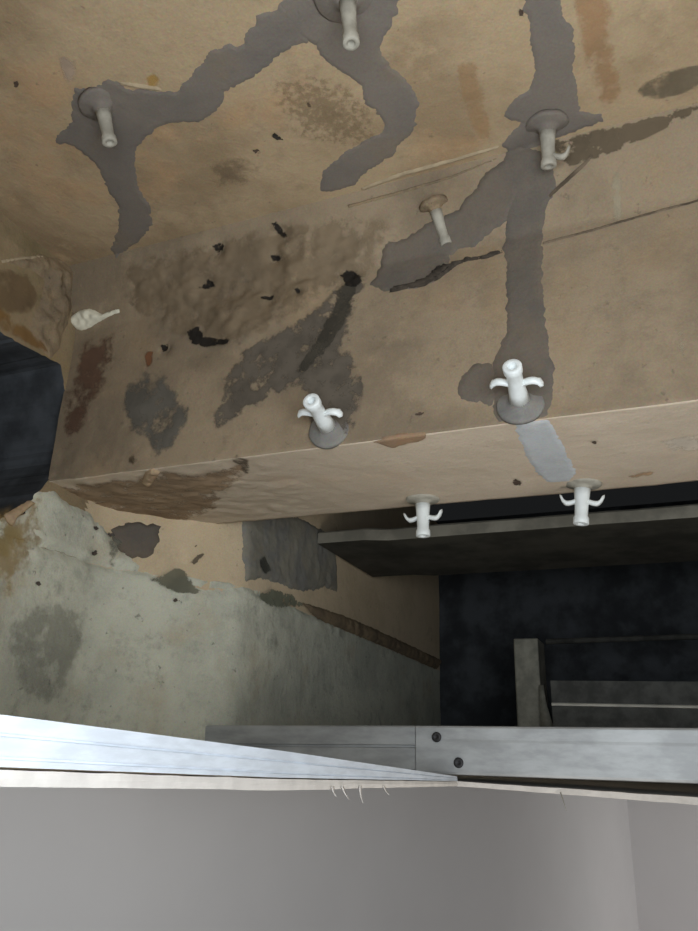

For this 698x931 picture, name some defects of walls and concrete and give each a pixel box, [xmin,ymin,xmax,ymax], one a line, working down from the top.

crack [55,0,420,258]
crack [214,0,698,482]
water stain [125,374,188,453]
spalling [64,465,242,520]
spalling [302,602,441,669]